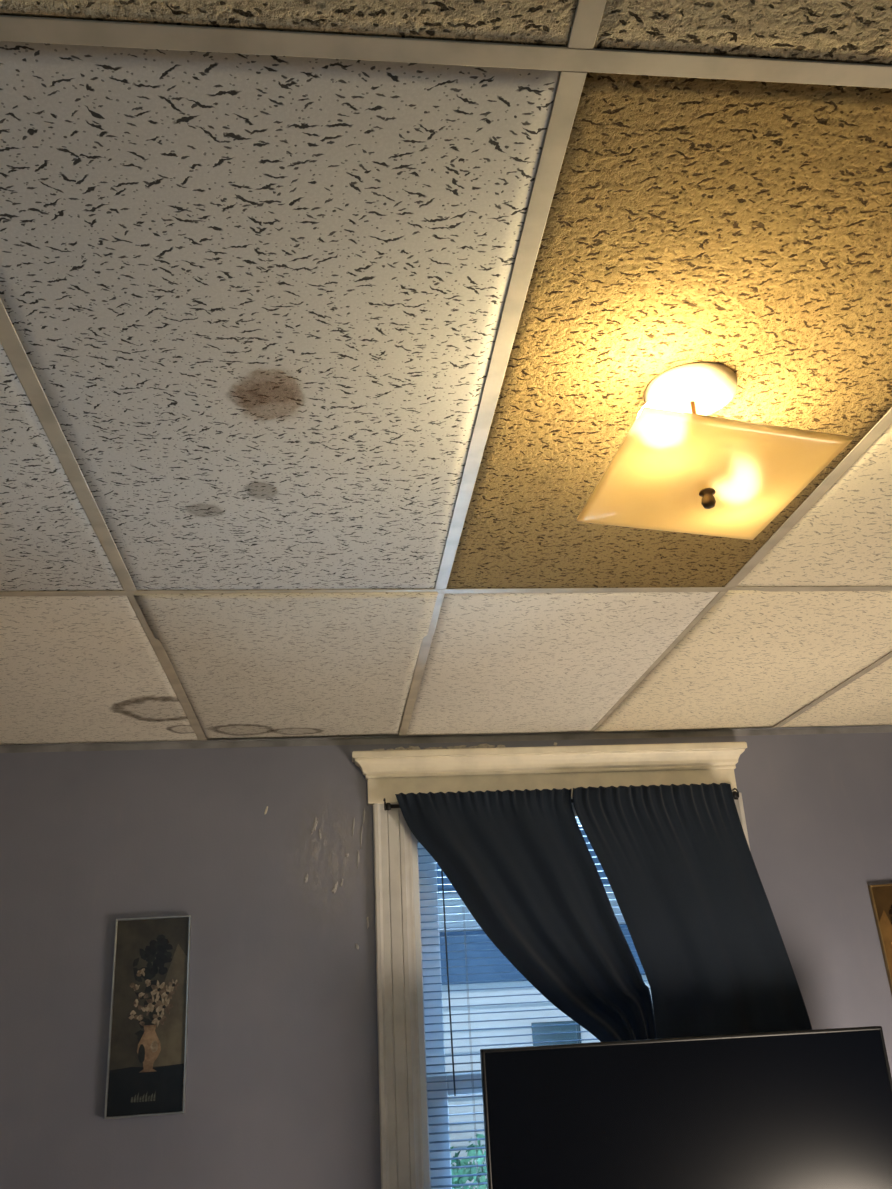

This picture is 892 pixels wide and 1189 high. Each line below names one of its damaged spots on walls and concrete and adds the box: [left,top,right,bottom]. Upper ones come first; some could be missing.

leakage [115,697,194,733]